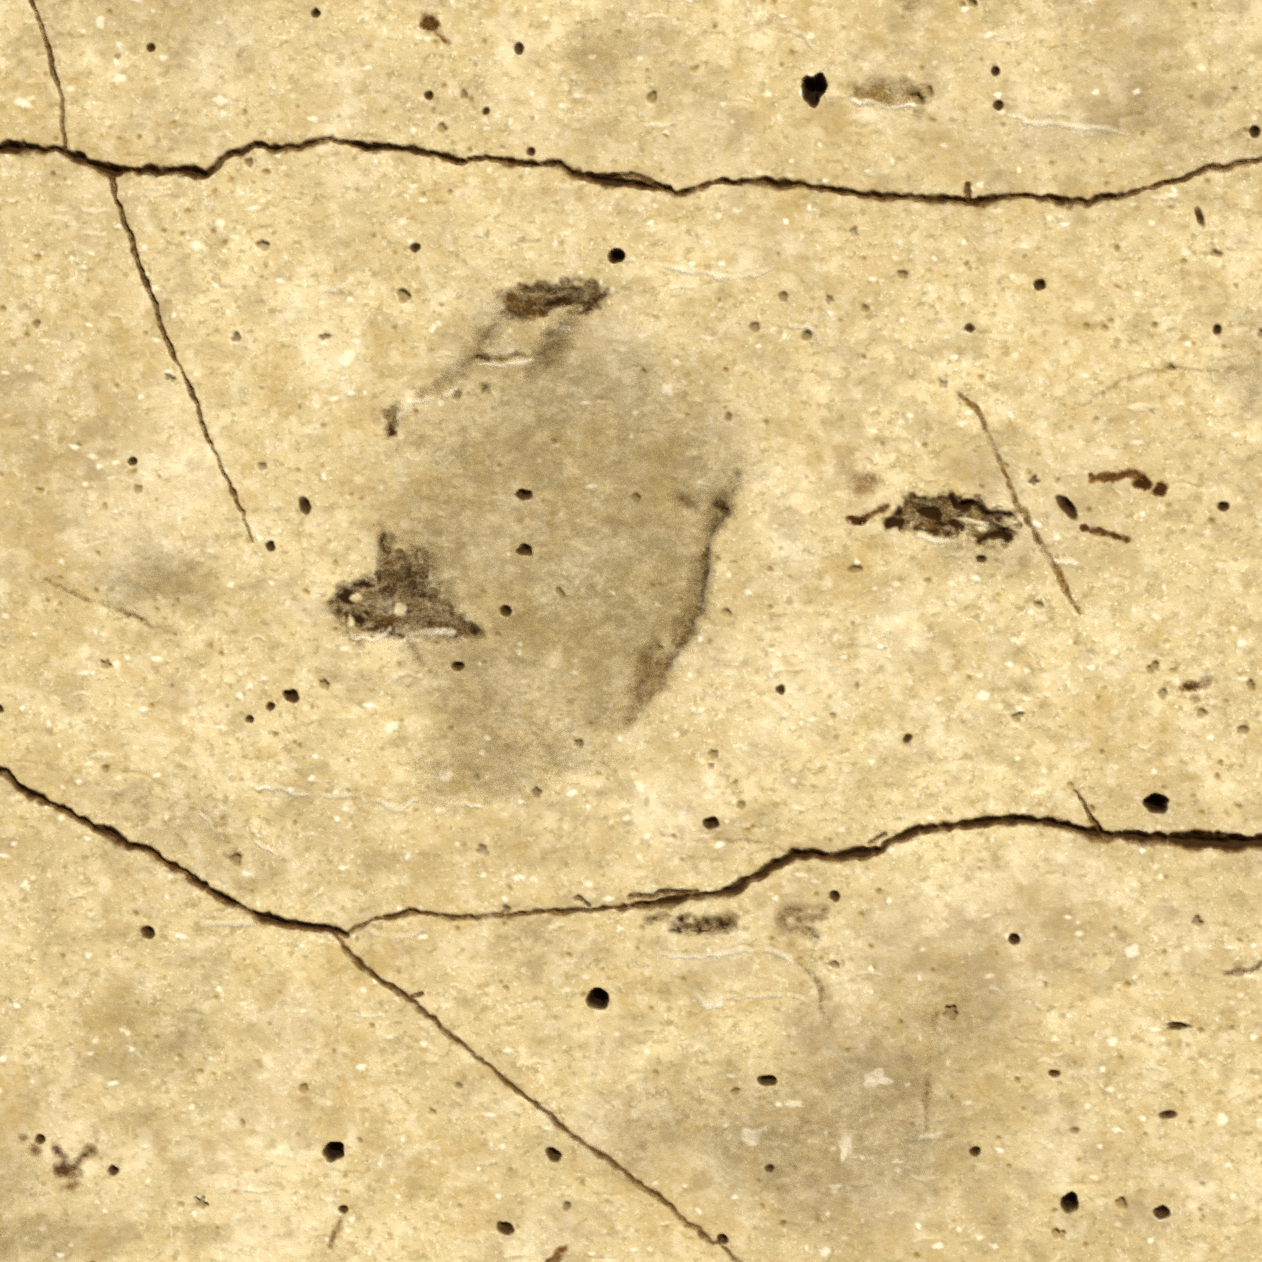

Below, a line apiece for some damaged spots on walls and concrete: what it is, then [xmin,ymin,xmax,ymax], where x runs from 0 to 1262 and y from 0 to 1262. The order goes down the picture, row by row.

spalling [459,279,607,375]
crack [0,0,1262,541]
spalling [330,533,480,642]
spalling [884,493,1020,545]
crack [958,394,1081,614]
crack [0,767,1262,1262]